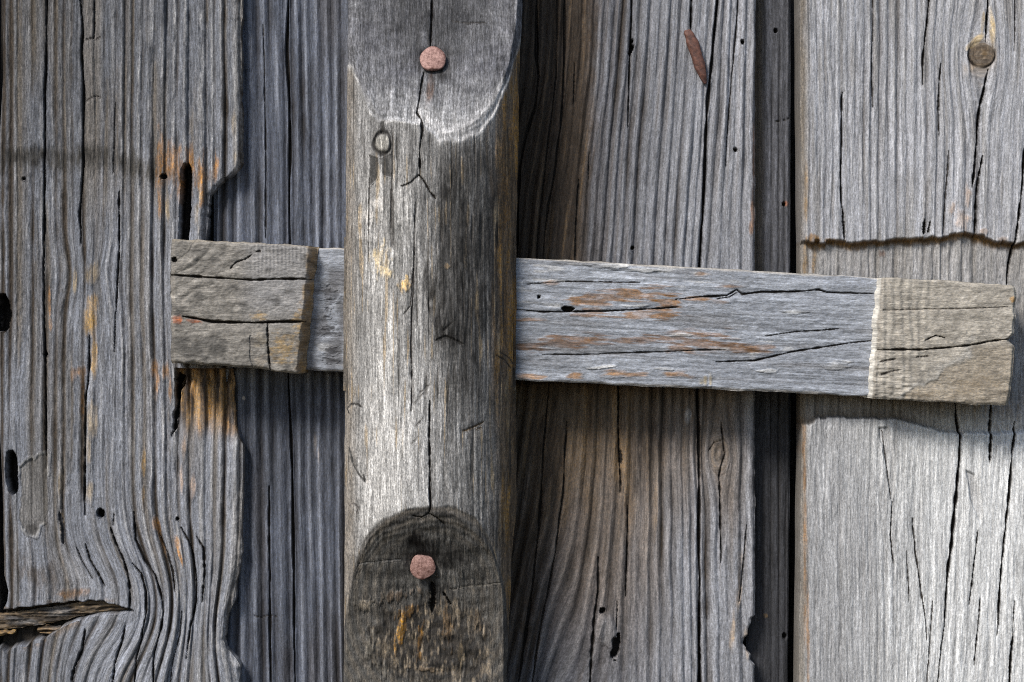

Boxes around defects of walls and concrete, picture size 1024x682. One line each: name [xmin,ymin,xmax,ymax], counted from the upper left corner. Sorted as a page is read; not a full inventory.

crack [57,0,207,682]
crack [170,274,312,282]
crack [367,72,445,525]
corrosion [409,37,459,115]
crack [516,0,1024,363]
crack [881,403,1017,682]